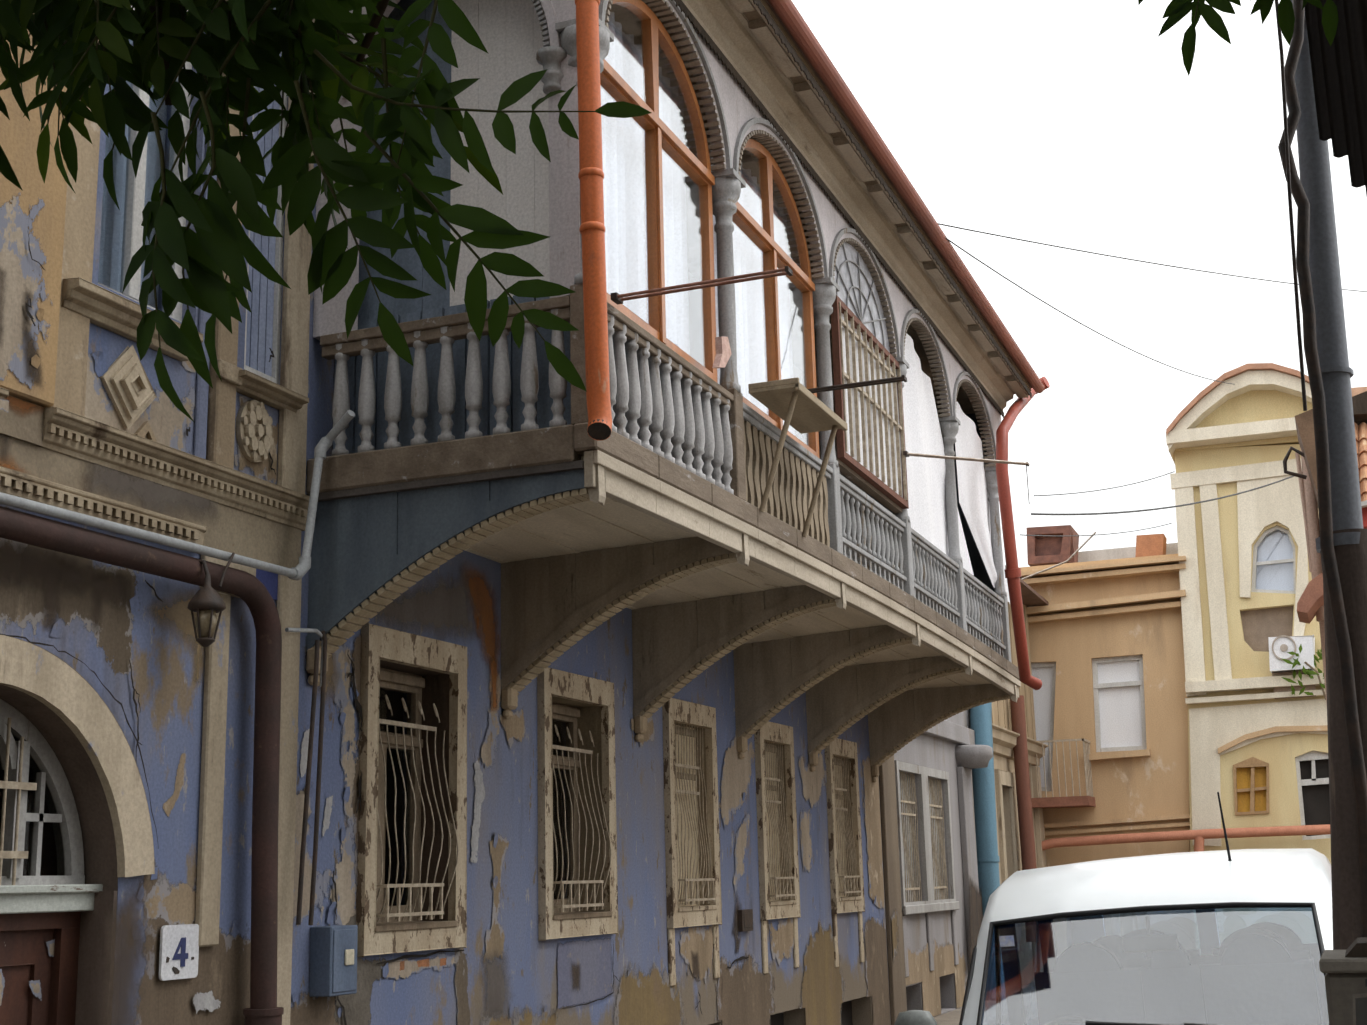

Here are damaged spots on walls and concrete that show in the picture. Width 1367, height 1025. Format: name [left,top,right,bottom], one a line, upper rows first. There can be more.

peeling [0,192,52,389]
leakage [0,540,128,627]
rust [465,572,498,709]
peeling [163,753,186,817]
peeling [293,635,362,926]
peeling [470,667,526,962]
peeling [719,736,755,892]
peeling [480,995,559,1025]
peeling [614,917,845,1025]